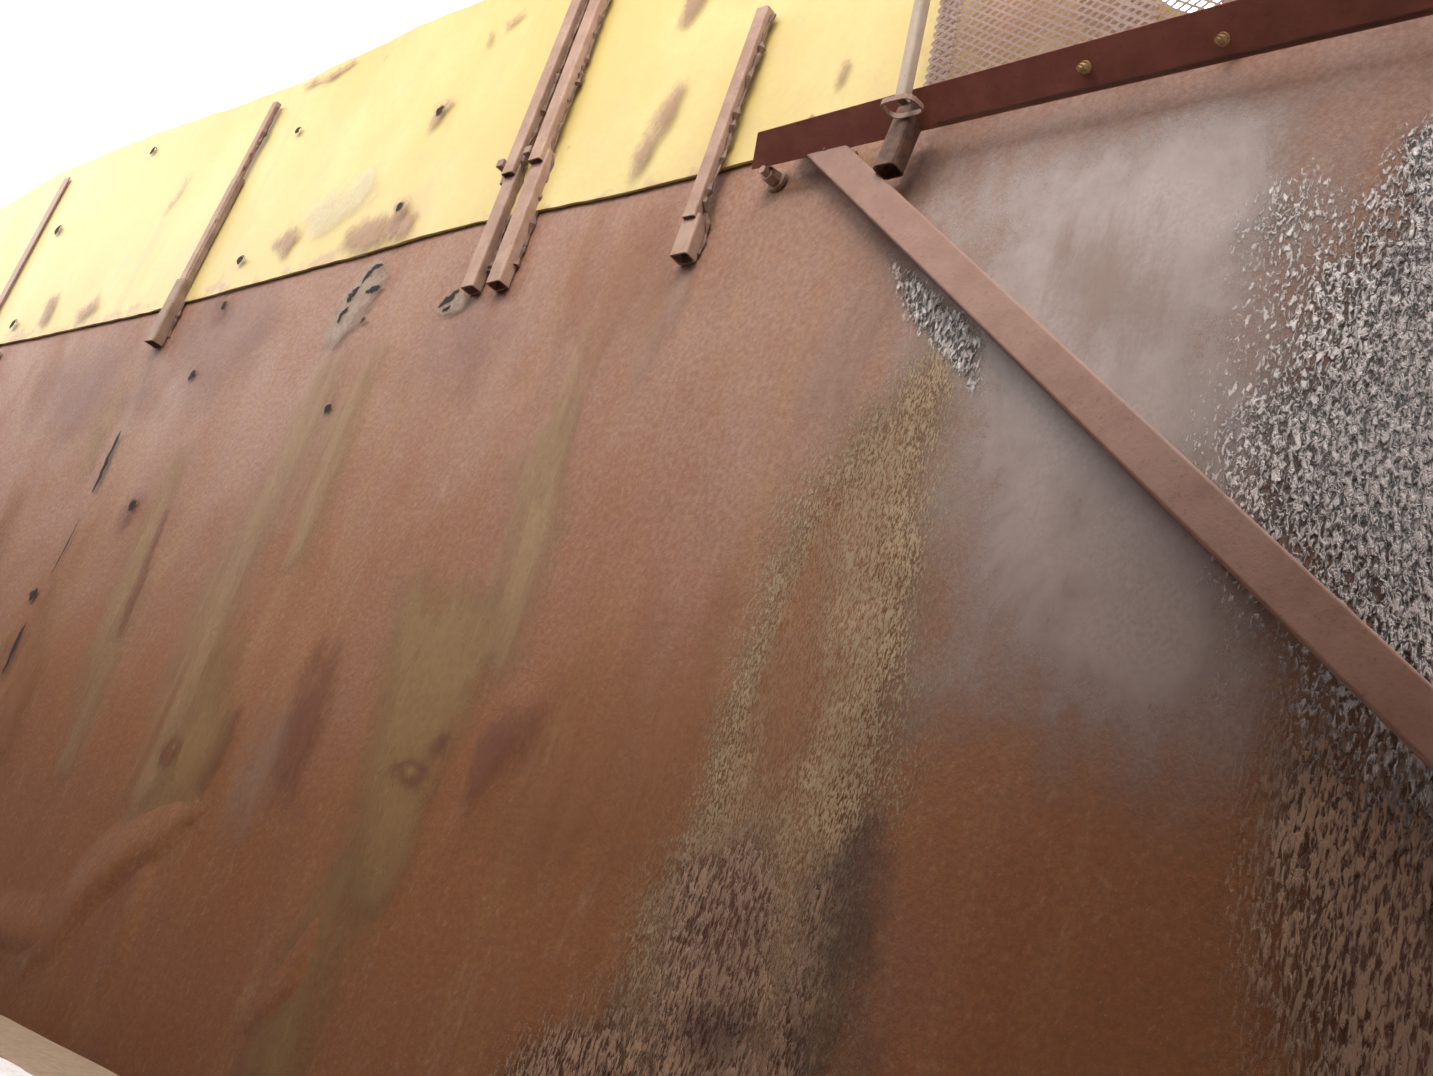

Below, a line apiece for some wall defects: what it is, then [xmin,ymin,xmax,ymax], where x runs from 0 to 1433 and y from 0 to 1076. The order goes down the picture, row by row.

corrosion [682,0,704,21]
corrosion [632,85,682,173]
corrosion [344,199,414,251]
corrosion [39,296,57,324]
spalling [337,263,383,323]